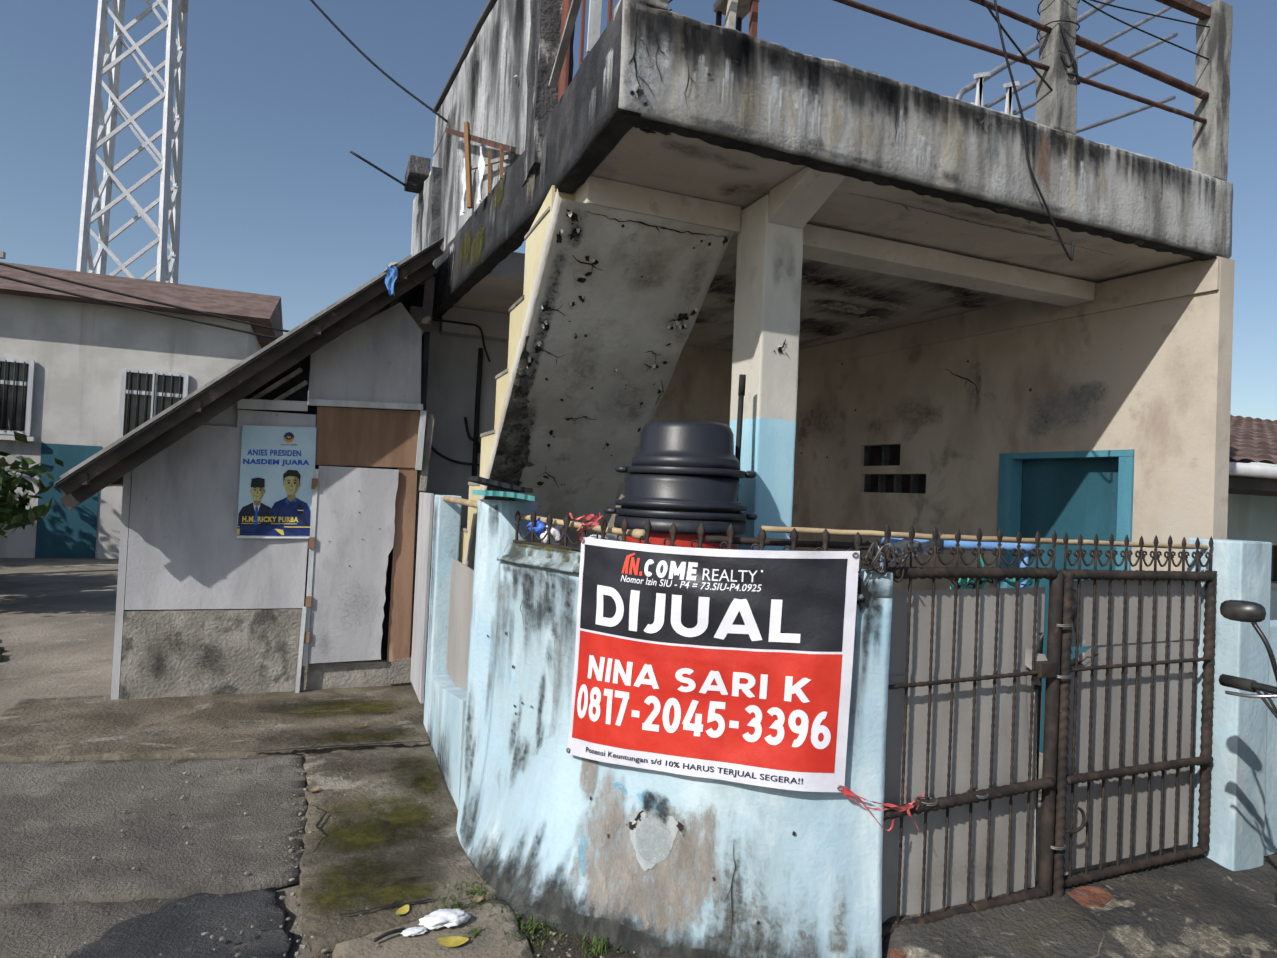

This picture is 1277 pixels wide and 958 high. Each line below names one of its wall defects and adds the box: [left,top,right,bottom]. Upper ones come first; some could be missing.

water stain [468,0,522,136]
crack [628,13,695,104]
water stain [624,0,1216,201]
spalling [555,209,582,245]
spalling [484,304,551,501]
spalling [569,255,599,339]
spalling [651,294,699,393]
water stain [496,552,580,777]
water stain [465,714,474,787]
water stain [460,800,763,958]
water stain [643,793,667,823]
peeling [570,758,780,954]